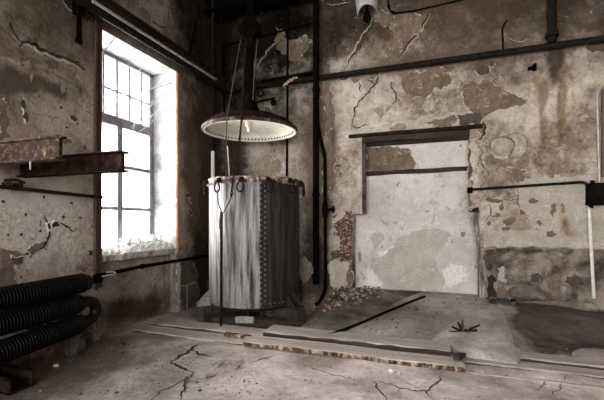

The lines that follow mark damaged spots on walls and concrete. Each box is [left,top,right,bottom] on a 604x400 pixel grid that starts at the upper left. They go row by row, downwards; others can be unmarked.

crack [9,22,86,72]
flaking render [274,27,312,62]
crack [331,17,375,68]
crack [398,14,430,59]
leakage [547,48,564,78]
flaking render [0,56,76,141]
crack [351,72,399,130]
spalling [351,61,604,305]
spalling [38,216,66,233]
spalling [327,211,355,292]
crack [151,344,211,400]
crack [297,361,441,400]